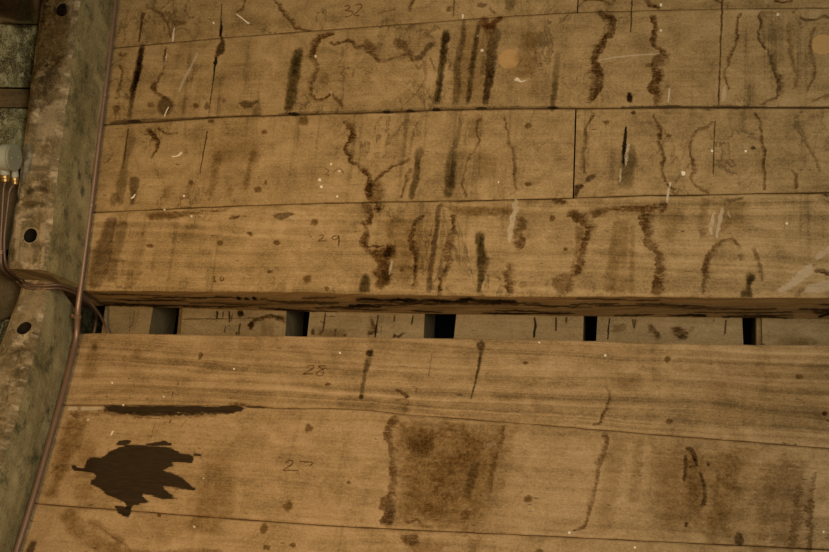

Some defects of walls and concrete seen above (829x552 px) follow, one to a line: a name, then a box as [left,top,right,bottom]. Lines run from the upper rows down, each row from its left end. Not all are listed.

damp [130,13,145,106]
damp [435,33,449,102]
damp [483,38,496,102]
damp [476,234,488,291]
damp [569,204,665,274]
damp [742,275,754,297]